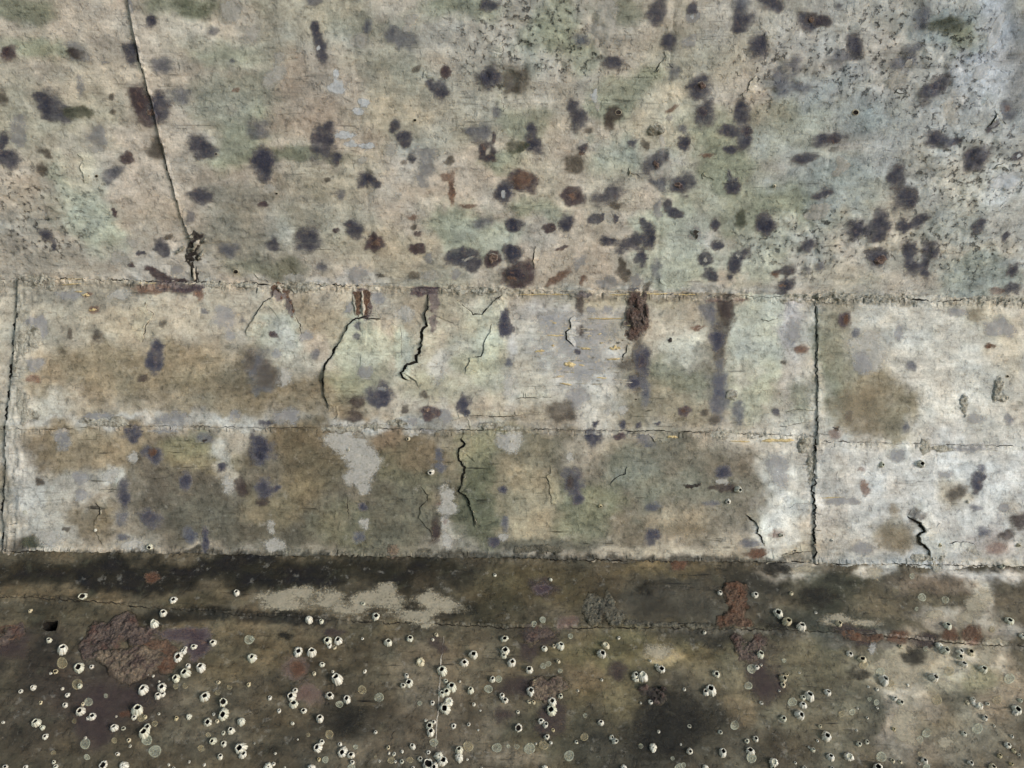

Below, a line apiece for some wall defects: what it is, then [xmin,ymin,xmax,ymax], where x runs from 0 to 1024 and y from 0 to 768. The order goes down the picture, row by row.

leakage [730,0,784,60]
leakage [32,90,92,123]
leakage [627,73,753,219]
leakage [558,184,660,291]
leakage [698,218,751,282]
leakage [846,163,940,279]
crack [321,293,510,420]
corrosion [620,291,651,342]
crack [418,392,551,541]
crack [908,500,979,562]
corrosion [73,611,212,750]
corrosion [715,581,785,706]